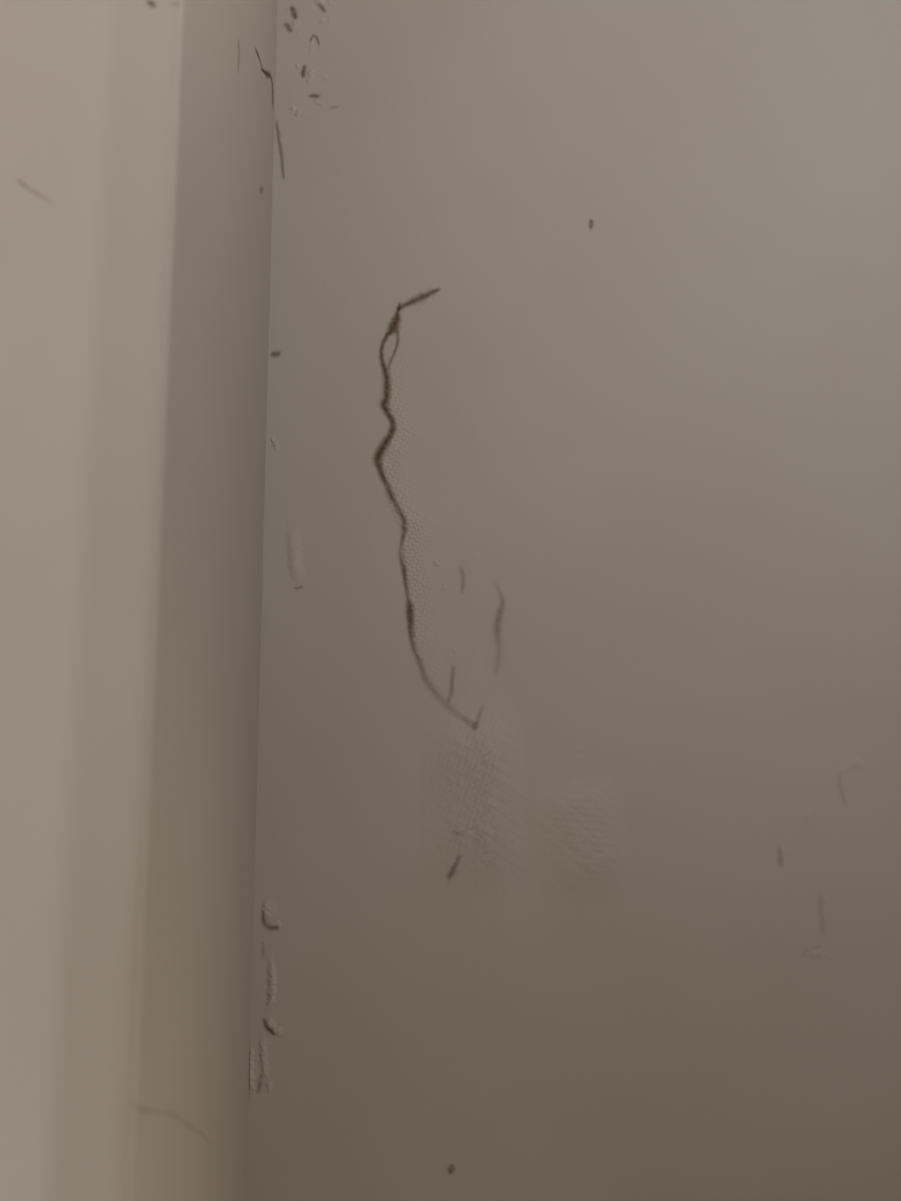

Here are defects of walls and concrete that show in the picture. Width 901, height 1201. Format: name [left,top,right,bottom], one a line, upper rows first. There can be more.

crack [375,279,478,694]